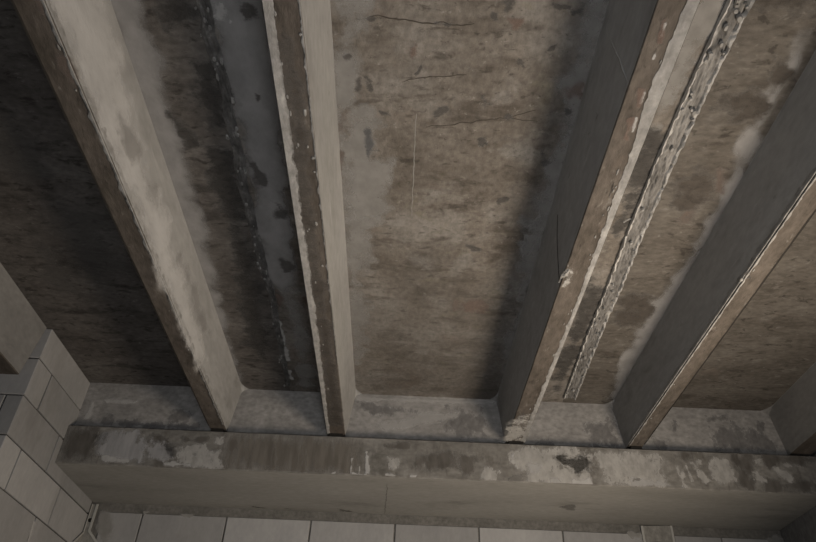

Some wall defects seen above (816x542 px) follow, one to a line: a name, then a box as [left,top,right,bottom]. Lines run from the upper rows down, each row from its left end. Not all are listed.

water stain [41,0,370,475]
water stain [334,0,395,364]
crack [357,15,474,26]
crack [426,110,535,128]
water stain [517,0,726,443]
water stain [611,51,816,445]
water stain [675,414,816,493]